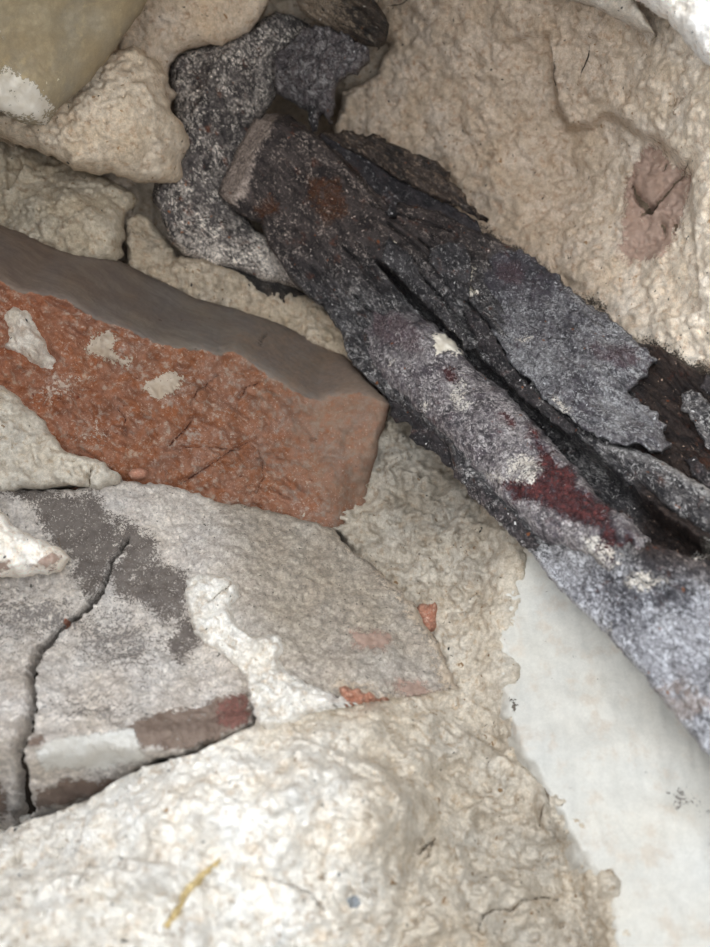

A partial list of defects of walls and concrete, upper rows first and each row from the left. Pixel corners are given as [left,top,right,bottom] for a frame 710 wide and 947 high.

rust [500,412,641,565]
crack [3,651,82,832]